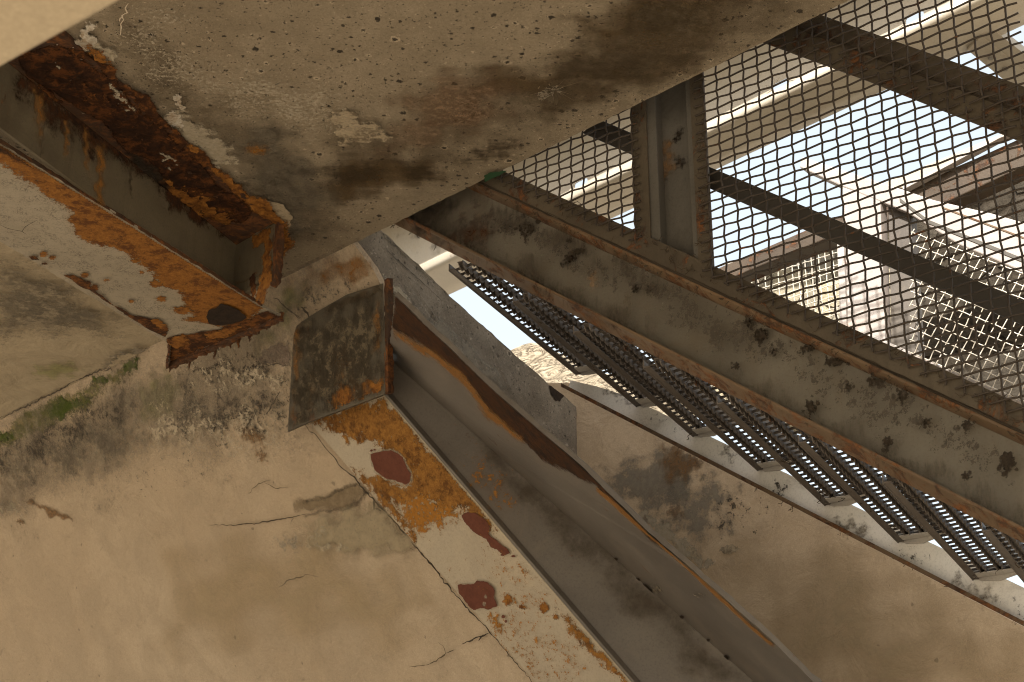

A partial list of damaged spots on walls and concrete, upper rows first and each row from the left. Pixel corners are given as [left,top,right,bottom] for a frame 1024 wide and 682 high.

water stain [404,0,744,145]
corrosion [0,44,295,369]
mould [0,388,166,497]
mould [165,348,290,467]
crack [215,513,307,526]
peeling [370,449,411,485]
crack [305,425,532,682]
corrosion [310,373,628,682]
peeling [458,580,507,623]
peeling [462,512,515,557]
corrosion [373,297,773,646]
water stain [607,449,768,569]